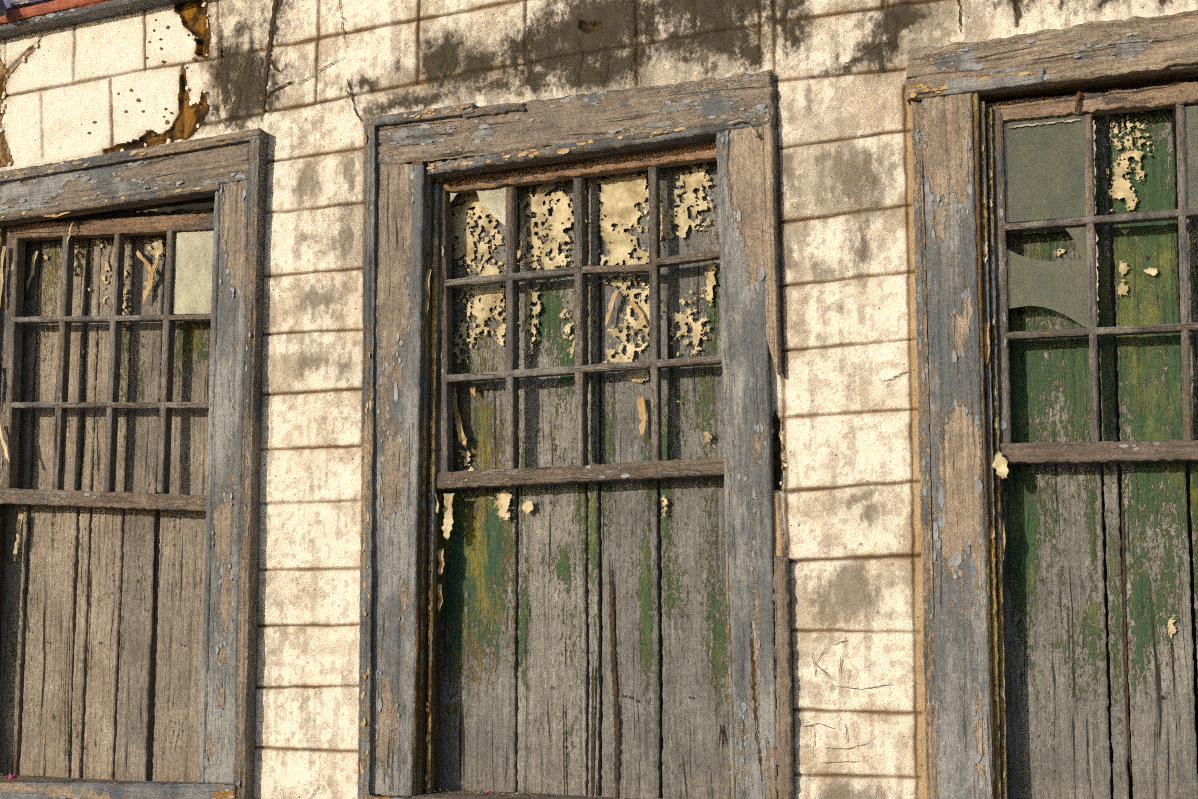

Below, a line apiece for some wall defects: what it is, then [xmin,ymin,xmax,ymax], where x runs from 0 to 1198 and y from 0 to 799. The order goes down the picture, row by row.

peeling [12,0,75,24]
spalling [0,37,125,205]
spalling [102,0,256,201]
leakage [340,0,813,118]
leakage [782,153,794,187]
leakage [816,146,880,206]
leakage [806,0,931,106]
leakage [992,0,1034,25]